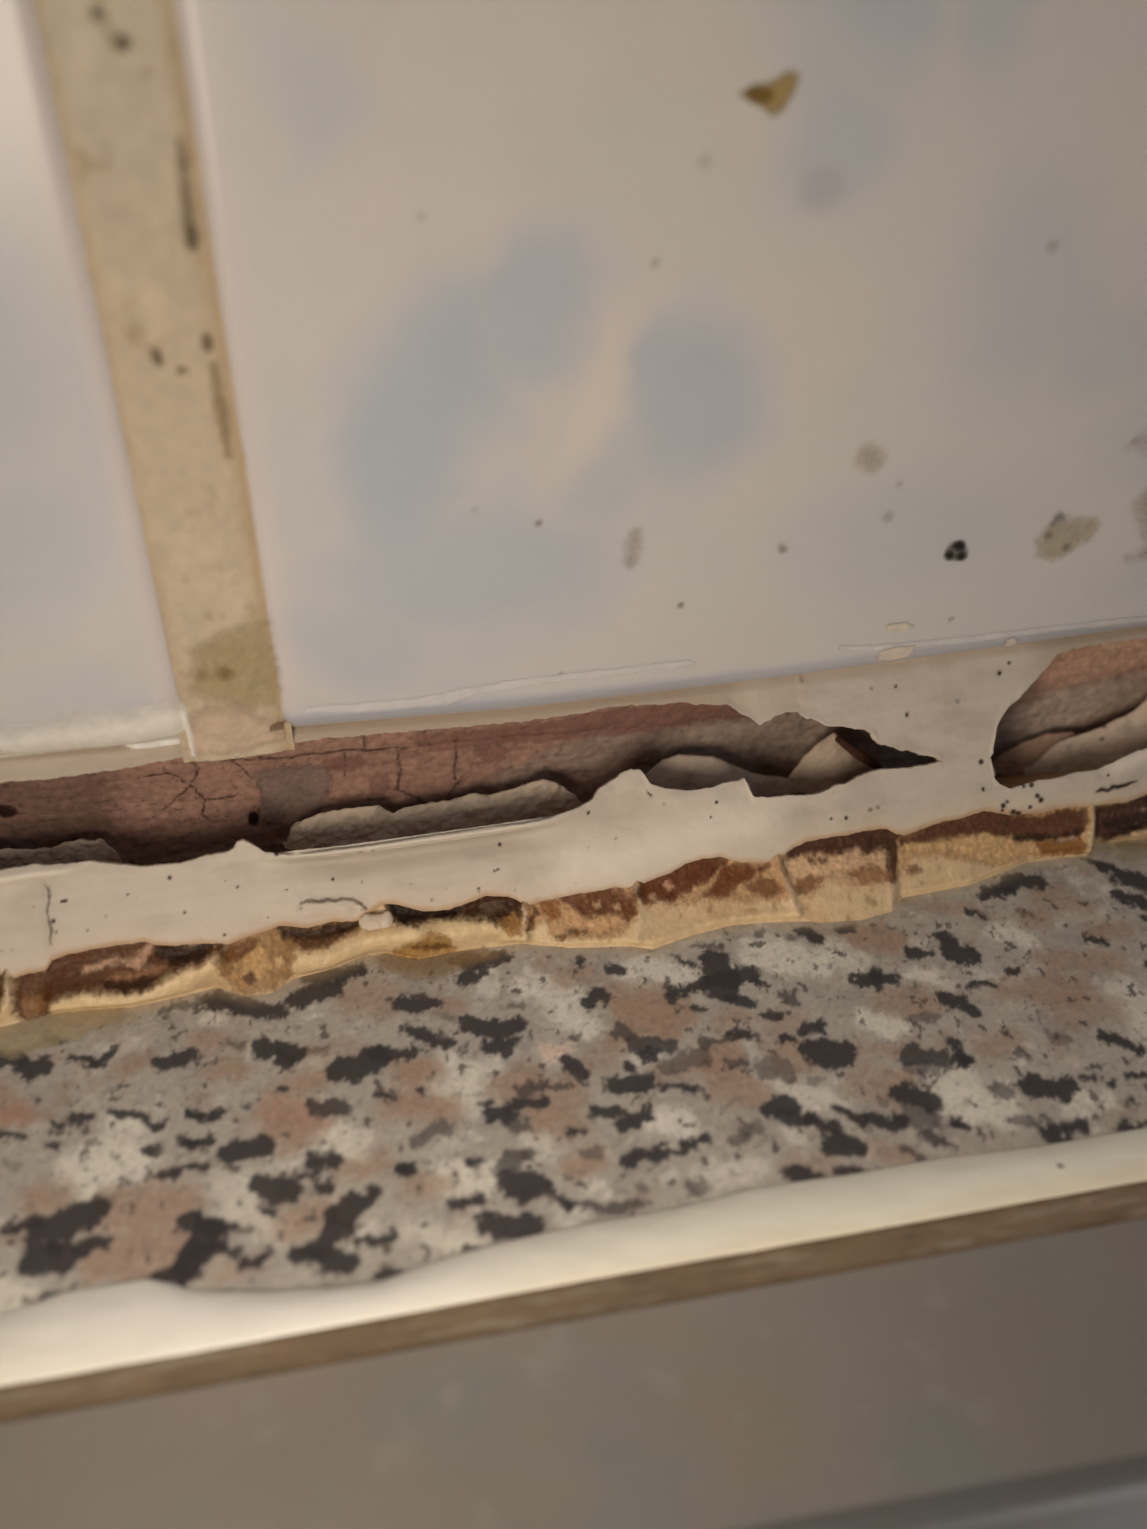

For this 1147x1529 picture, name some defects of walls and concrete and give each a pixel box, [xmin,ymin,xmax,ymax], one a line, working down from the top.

peeling [839,617,1147,661]
peeling [305,660,694,713]
peeling [0,704,196,757]
flaking render [417,703,745,763]
flaking render [0,805,17,817]
flaking render [248,756,388,825]